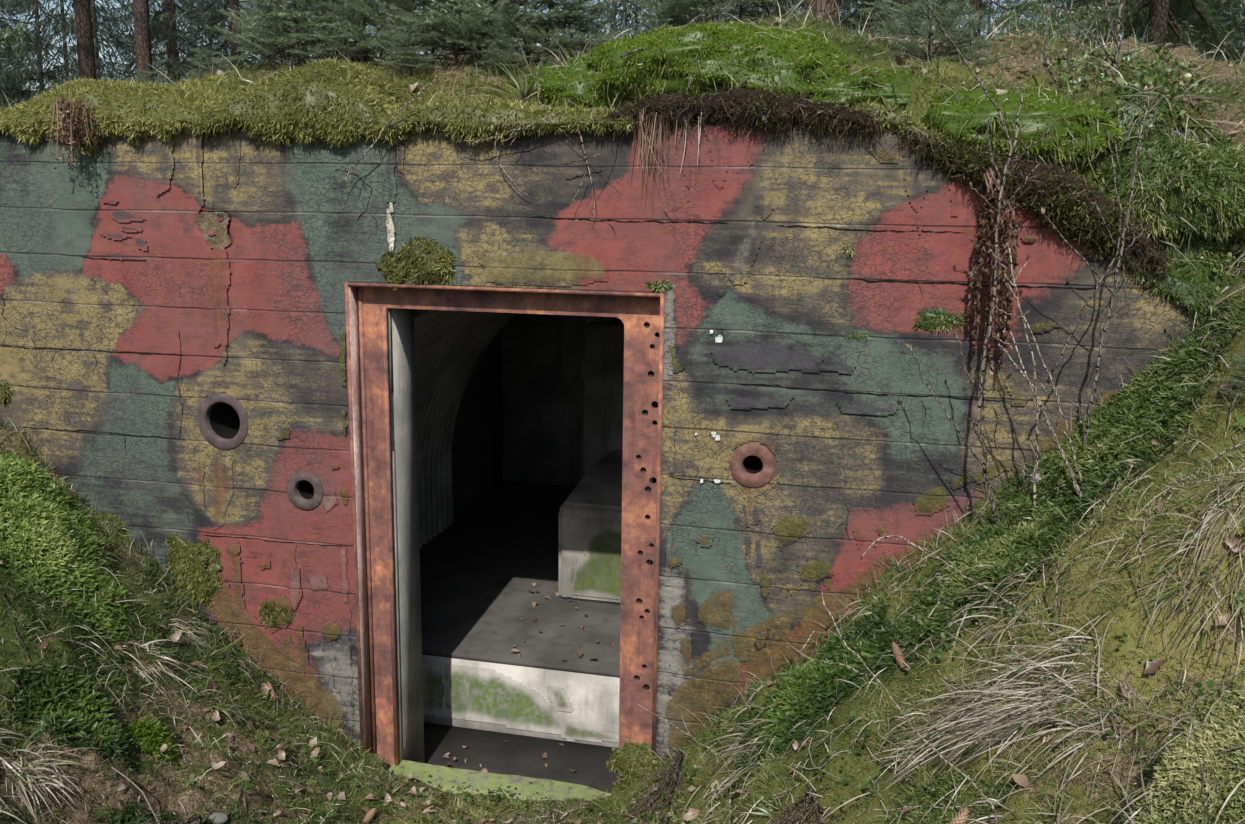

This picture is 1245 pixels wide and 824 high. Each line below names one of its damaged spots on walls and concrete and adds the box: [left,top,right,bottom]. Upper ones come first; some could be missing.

peeling [287,547,354,733]
water stain [669,599,693,670]